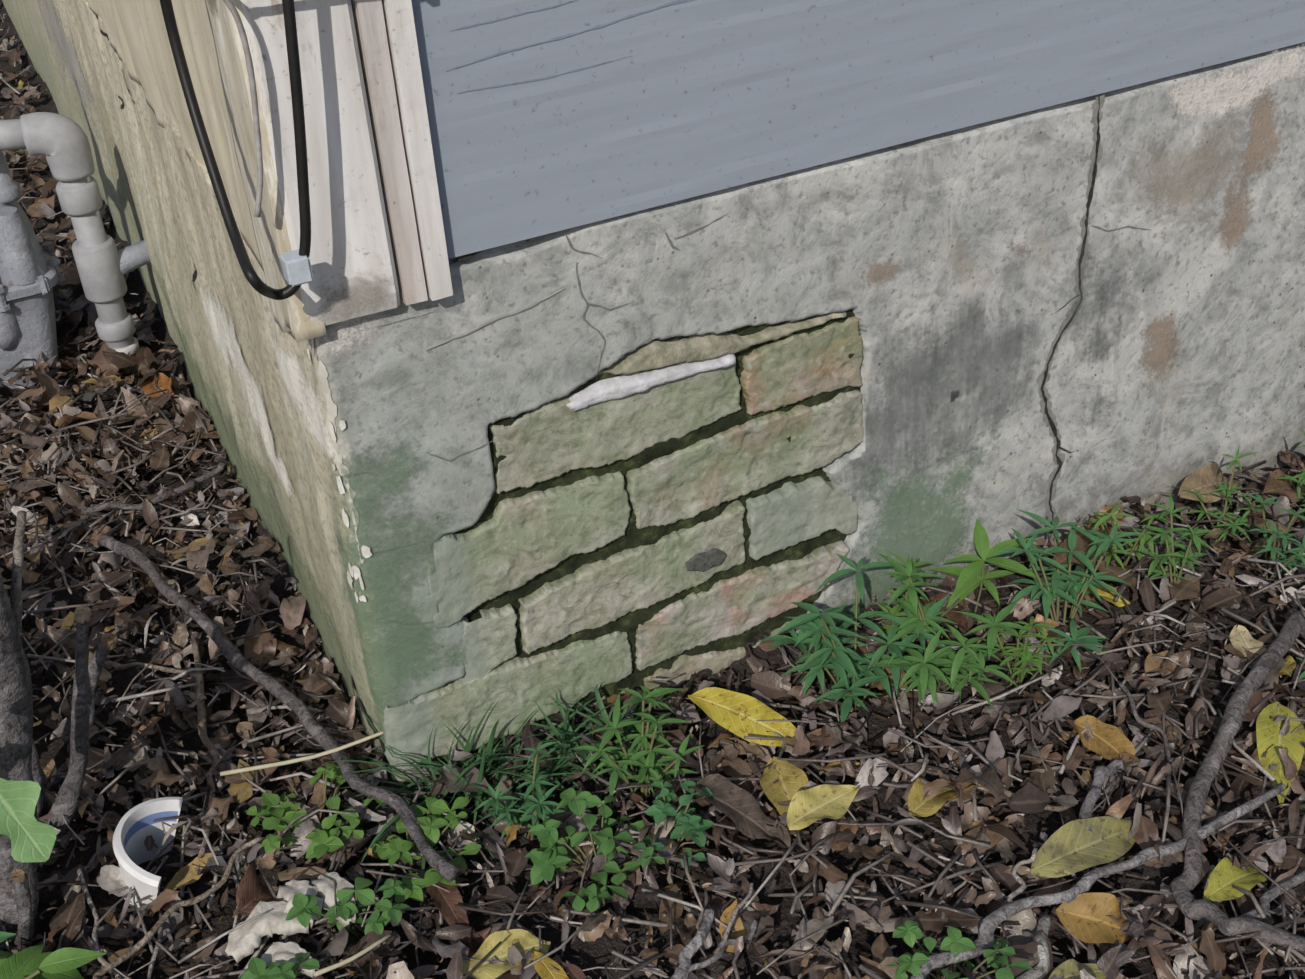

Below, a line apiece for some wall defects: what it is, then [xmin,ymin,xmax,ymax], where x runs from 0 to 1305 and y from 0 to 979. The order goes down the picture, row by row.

crack [96,16,134,111]
crack [665,212,730,250]
crack [564,233,630,380]
crack [1036,95,1150,540]
spalling [382,309,864,774]